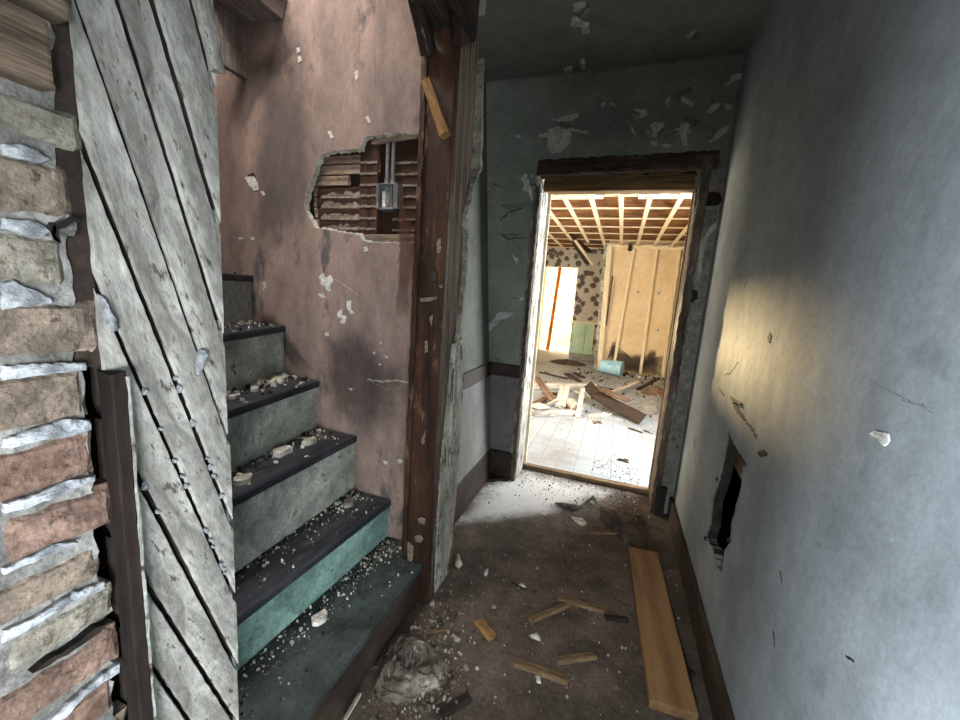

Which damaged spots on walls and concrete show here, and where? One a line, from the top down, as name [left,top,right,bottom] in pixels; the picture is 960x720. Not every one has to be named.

flaking render [304,131,419,252]
peeling [538,113,588,153]
flaking render [624,64,743,496]
crack [367,379,408,390]
spalling [704,433,747,572]